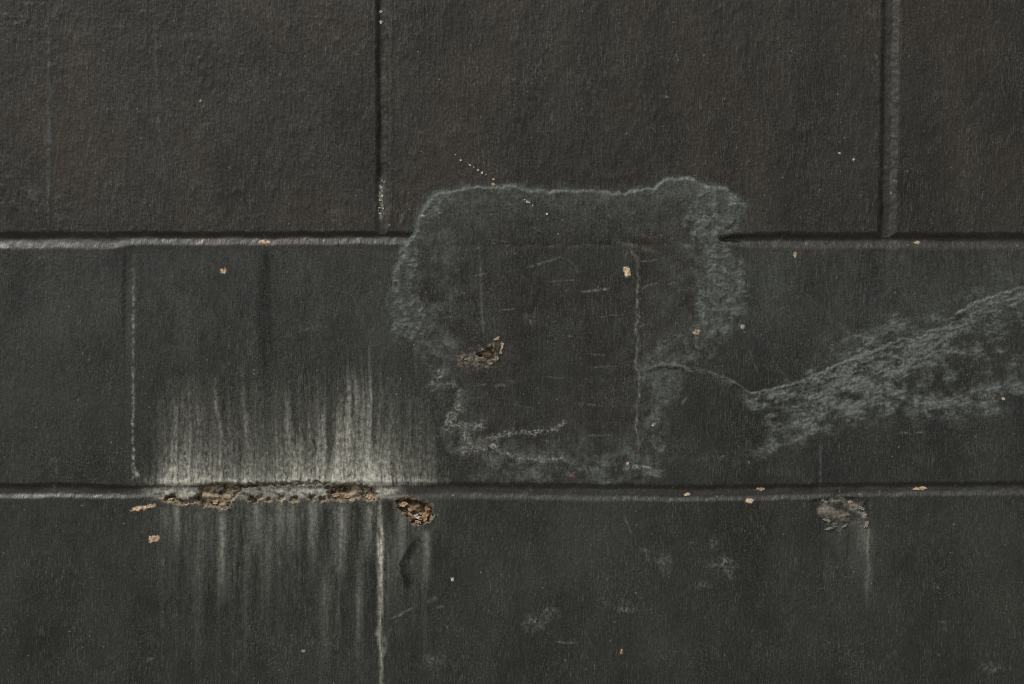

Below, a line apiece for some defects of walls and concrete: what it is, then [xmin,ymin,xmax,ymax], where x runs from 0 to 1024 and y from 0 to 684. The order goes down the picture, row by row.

spalling [457,336,504,368]
spalling [132,480,379,512]
spalling [394,495,435,527]
spalling [814,496,869,530]
water stain [156,407,430,666]